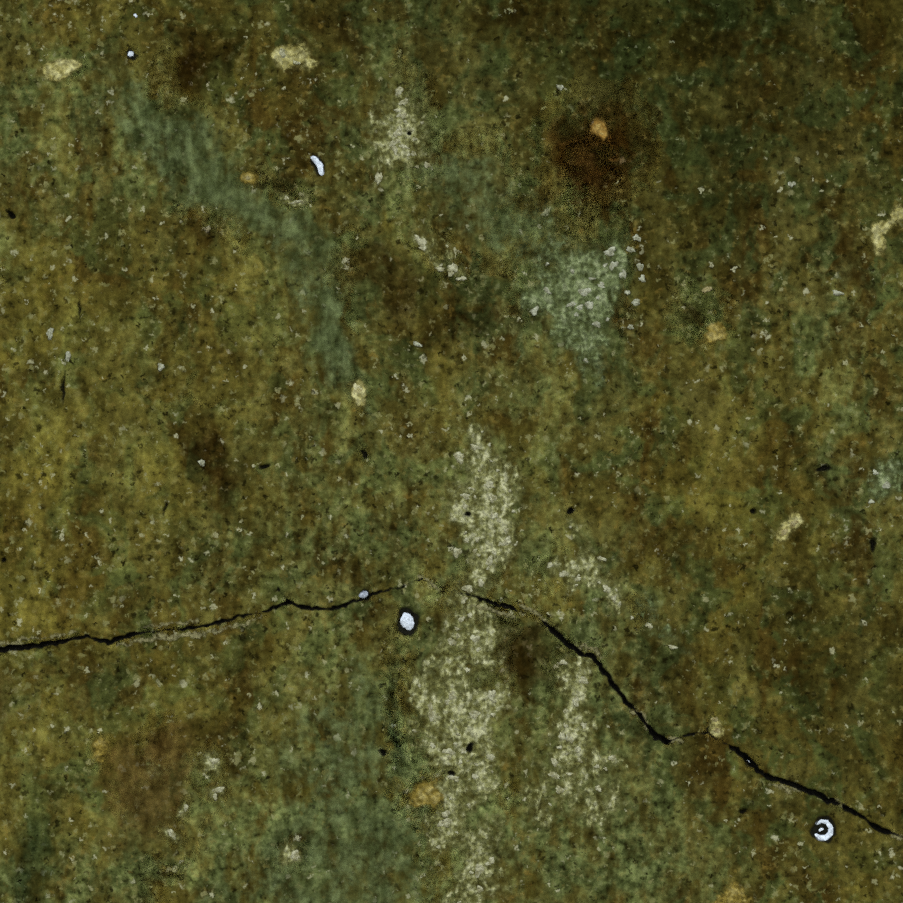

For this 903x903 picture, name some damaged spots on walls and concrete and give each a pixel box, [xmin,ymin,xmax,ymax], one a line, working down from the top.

corrosion [591,119,608,140]
crack [0,575,902,840]